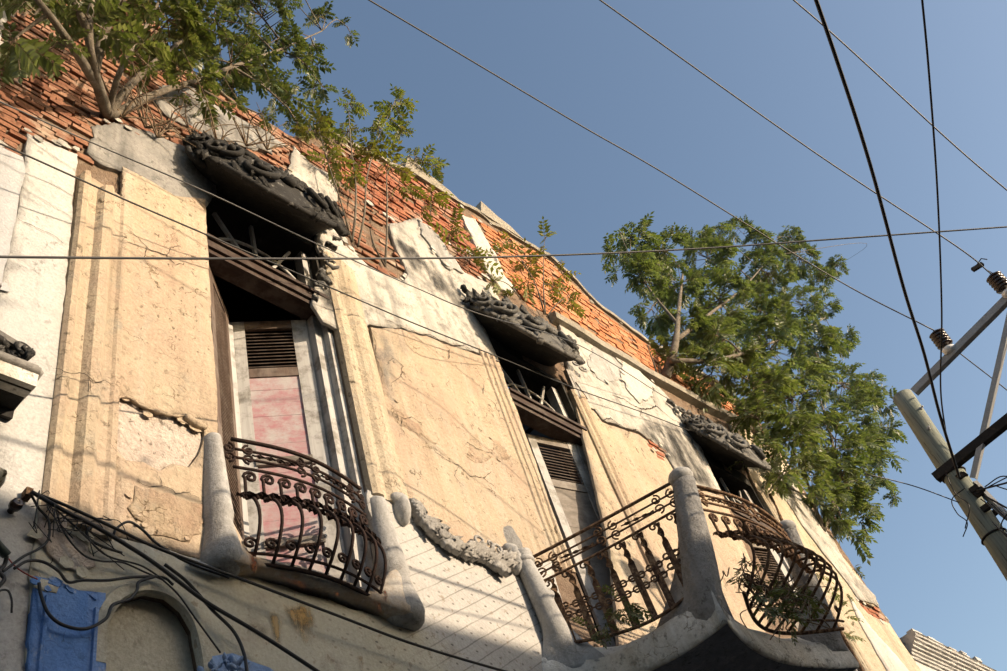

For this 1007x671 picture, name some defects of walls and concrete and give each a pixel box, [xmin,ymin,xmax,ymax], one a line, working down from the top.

spalling [0,2,739,416]
crack [373,320,511,423]
spalling [117,394,210,471]
spalling [125,485,204,542]